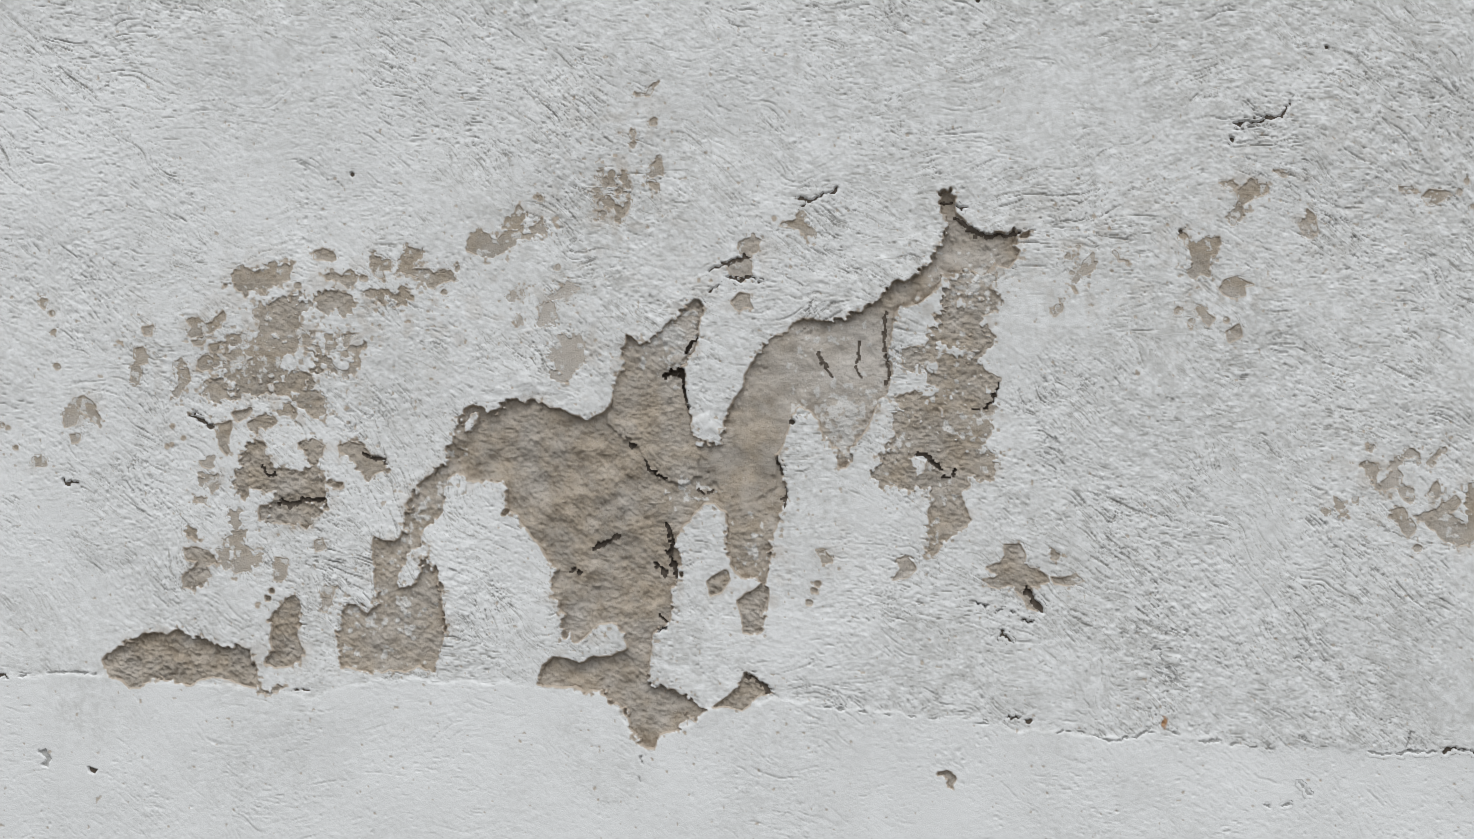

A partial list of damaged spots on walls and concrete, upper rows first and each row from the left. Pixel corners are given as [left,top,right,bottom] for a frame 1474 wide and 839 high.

peeling [1173,168,1289,342]
peeling [37,295,58,337]
peeling [60,394,101,443]
spalling [103,189,1033,747]
peeling [1321,442,1474,555]
peeling [985,542,1085,614]
crack [0,671,97,679]
crack [745,673,776,694]
crack [1365,732,1474,759]